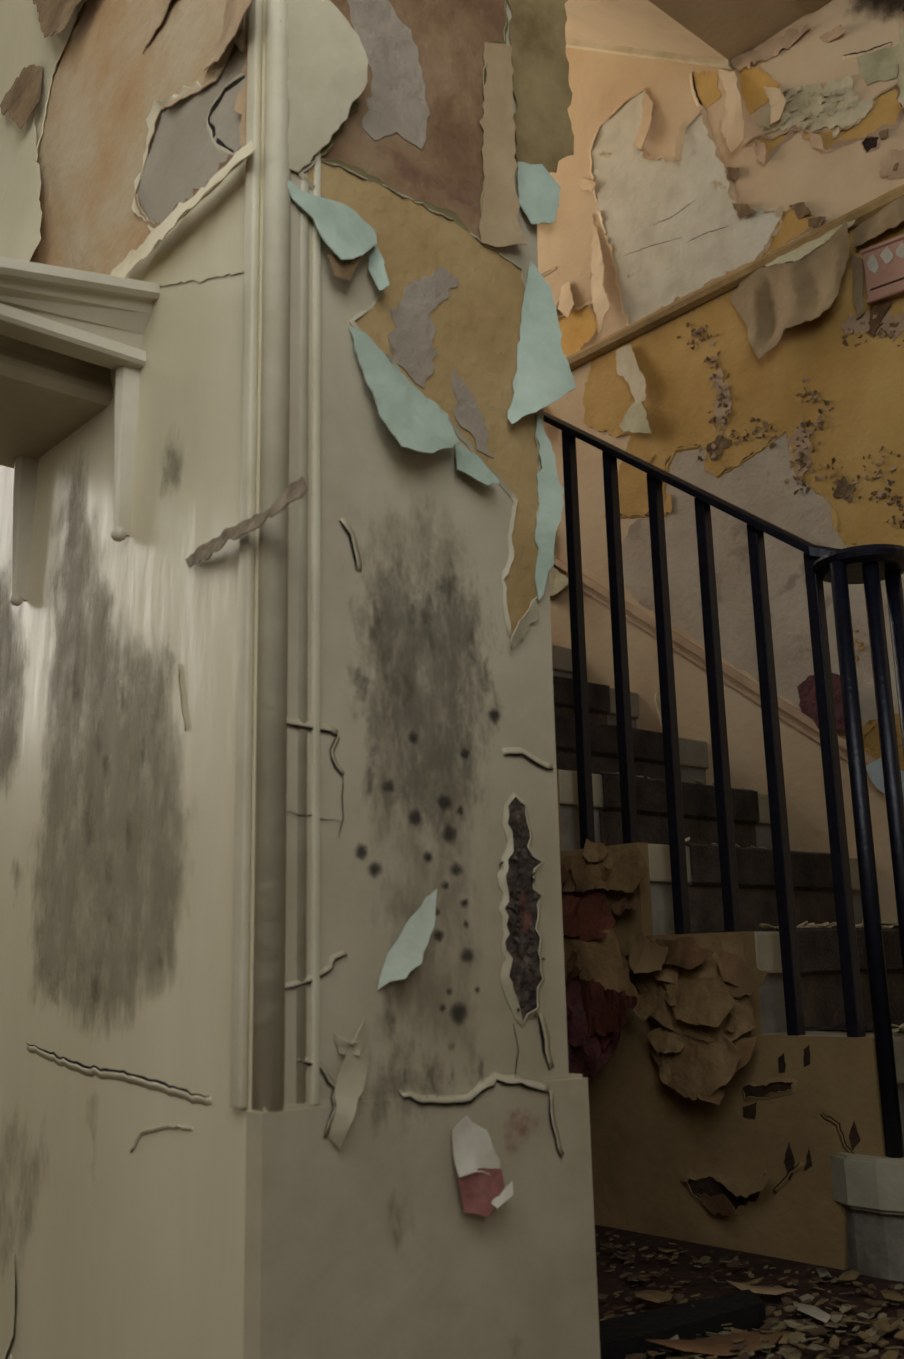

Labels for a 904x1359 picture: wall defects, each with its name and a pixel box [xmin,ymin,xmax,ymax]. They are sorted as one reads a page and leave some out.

spalling [0,0,256,286]
peeling [280,0,904,733]
leakage [0,582,23,778]
leakage [36,474,186,1023]
peeling [848,584,885,794]
crack [26,1042,212,1106]
leakage [357,845,381,875]
leakage [441,990,466,1021]
crack [397,1011,564,1158]
peeling [452,1116,513,1217]
spalling [497,792,546,1027]
crack [2,1253,16,1359]